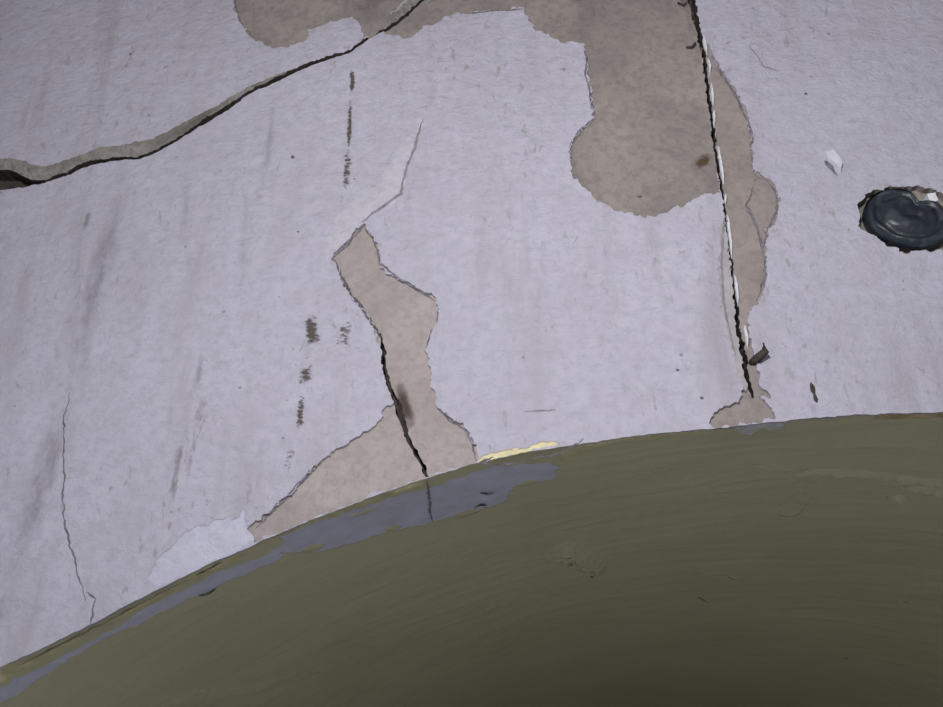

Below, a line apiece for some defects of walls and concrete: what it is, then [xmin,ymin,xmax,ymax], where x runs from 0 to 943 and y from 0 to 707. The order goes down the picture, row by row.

crack [0,0,433,190]
spalling [233,0,404,48]
spalling [385,0,785,435]
crack [688,0,754,398]
spalling [857,185,943,232]
spalling [0,115,711,703]
crack [333,259,433,522]